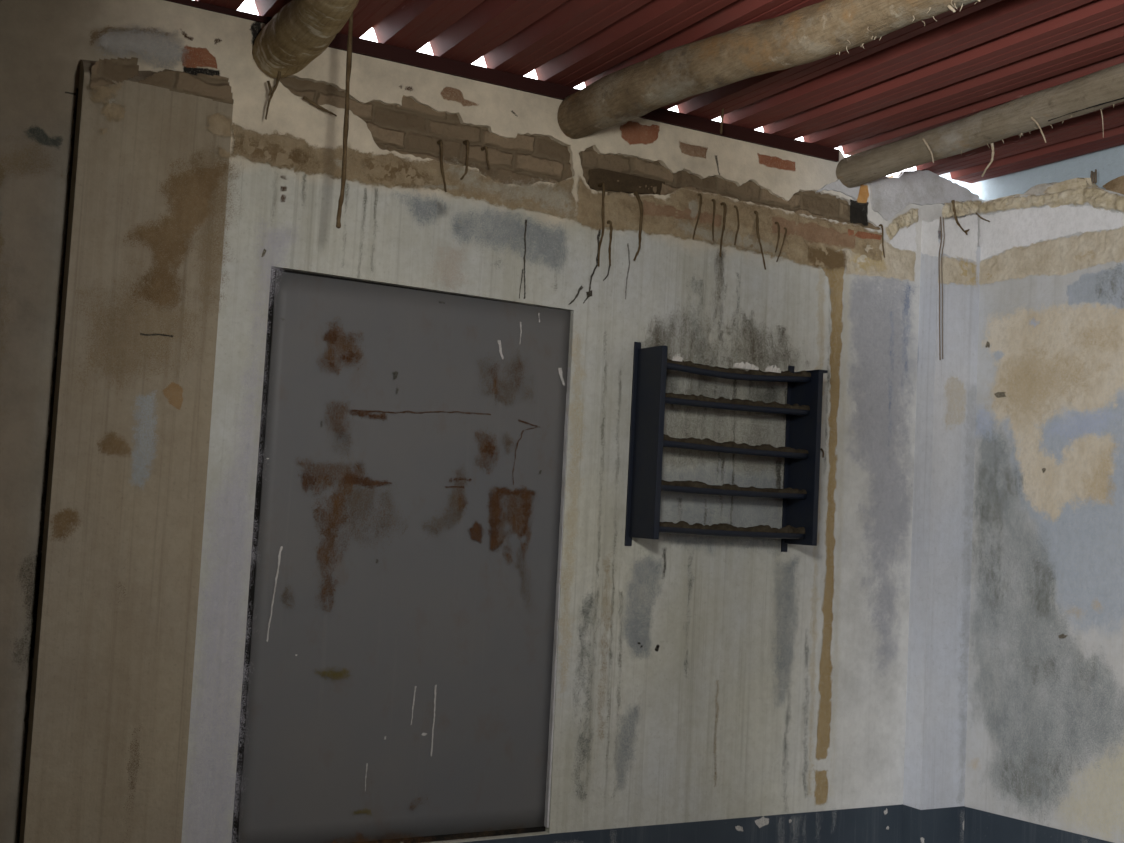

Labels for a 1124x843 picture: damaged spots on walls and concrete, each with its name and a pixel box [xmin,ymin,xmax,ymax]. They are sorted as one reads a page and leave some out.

spalling [89,25,234,104]
spalling [230,77,919,282]
spalling [938,175,1124,288]
rust [422,428,539,612]
water stain [555,247,852,813]
water stain [955,384,1124,843]